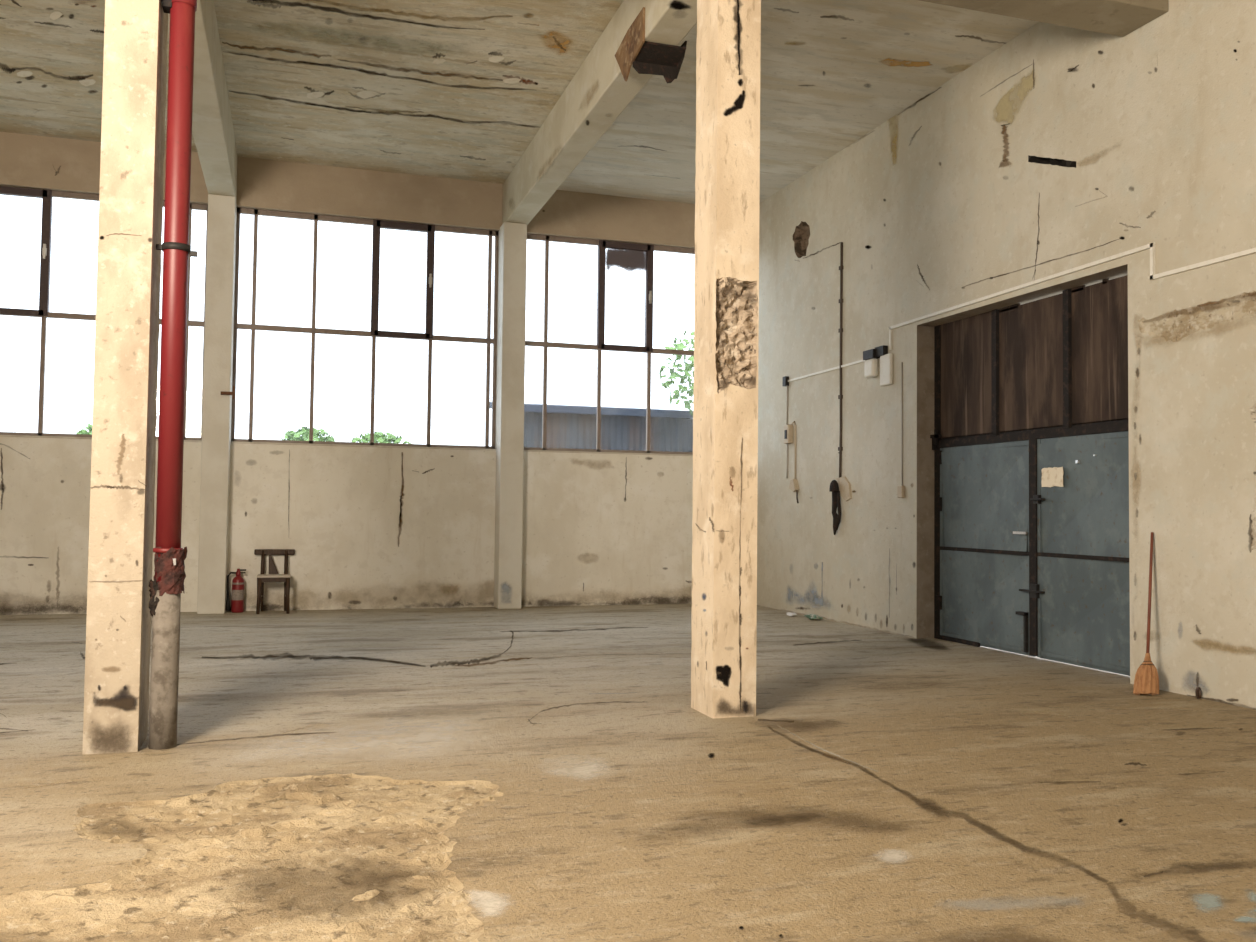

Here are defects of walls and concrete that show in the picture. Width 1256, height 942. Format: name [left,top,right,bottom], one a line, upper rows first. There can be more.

crack [0,17,104,33]
crack [248,0,511,30]
crack [222,42,535,127]
crack [724,0,745,116]
spalling [715,277,758,393]
flaking render [1137,290,1256,342]
crack [1,448,30,510]
crack [397,452,405,547]
crack [202,630,565,667]